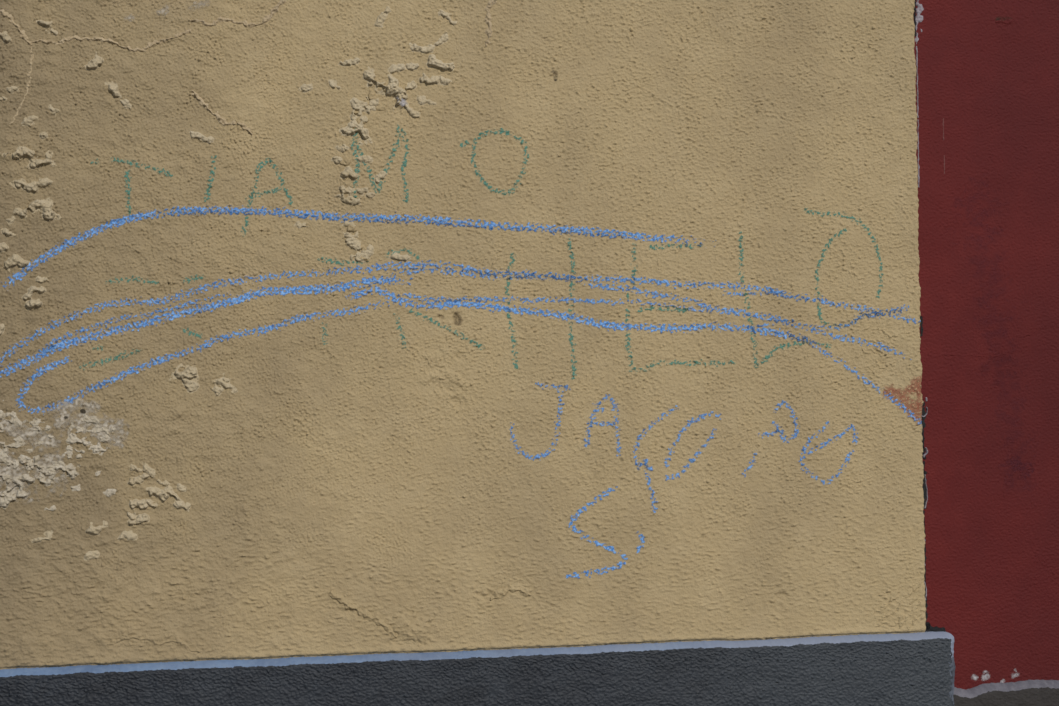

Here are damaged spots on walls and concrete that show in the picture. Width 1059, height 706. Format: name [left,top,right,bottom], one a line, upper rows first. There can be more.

spalling [0,398,128,509]